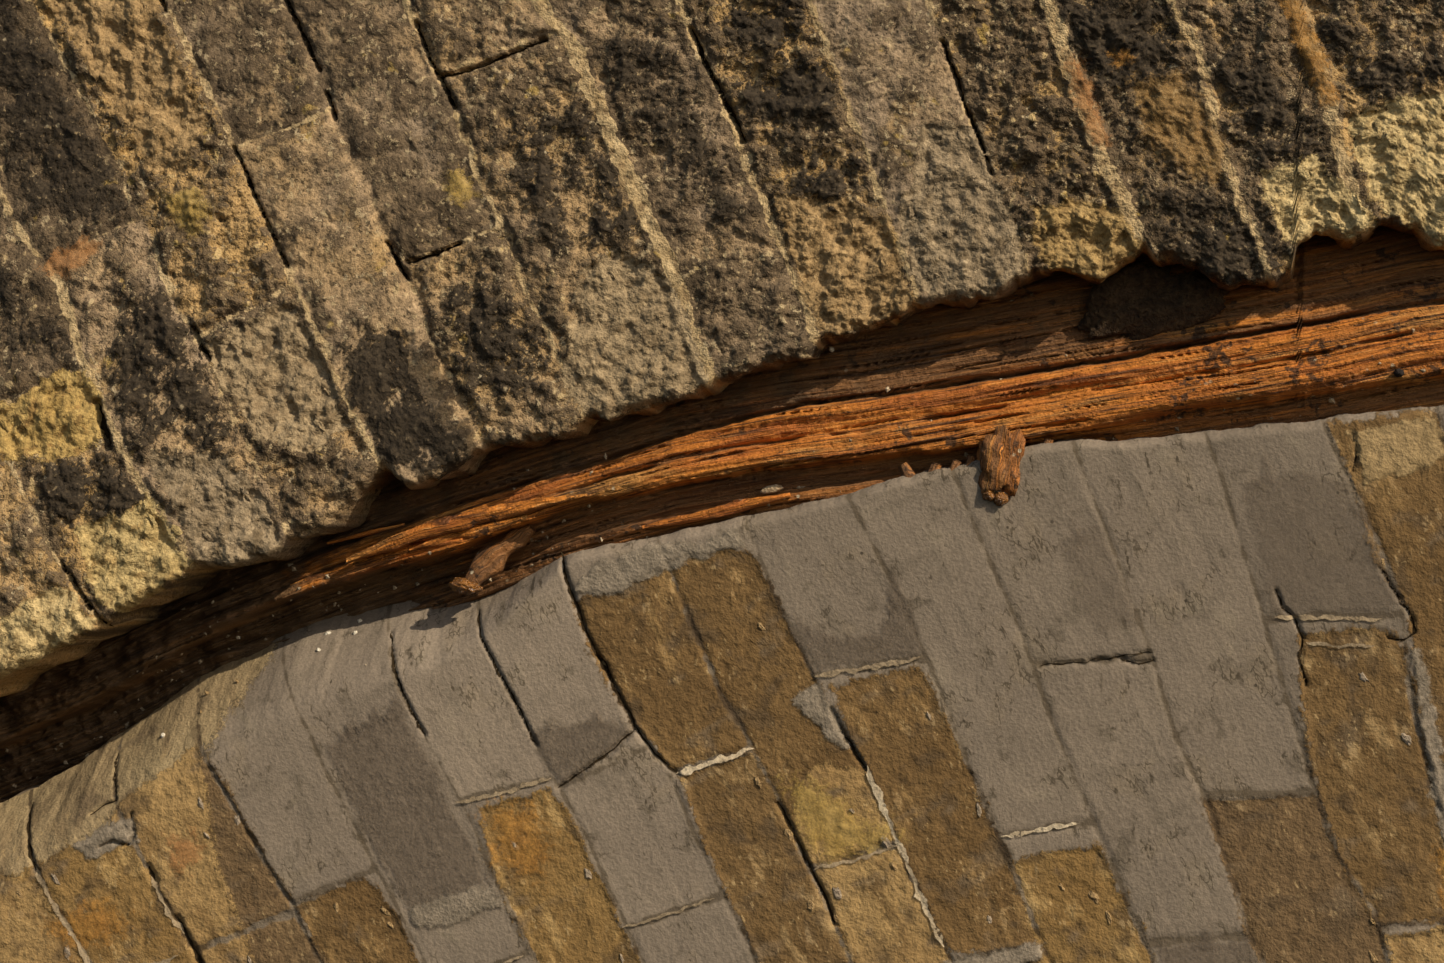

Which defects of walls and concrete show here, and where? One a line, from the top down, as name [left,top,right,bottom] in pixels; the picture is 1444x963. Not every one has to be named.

damp [0,0,136,233]
damp [105,276,253,463]
damp [335,318,474,486]
crack [387,242,461,280]
crack [417,25,548,108]
damp [421,256,553,409]
damp [502,75,643,266]
damp [724,0,882,214]
damp [1150,184,1293,287]
damp [40,452,156,530]
crack [1276,590,1308,685]
crack [1382,569,1417,640]